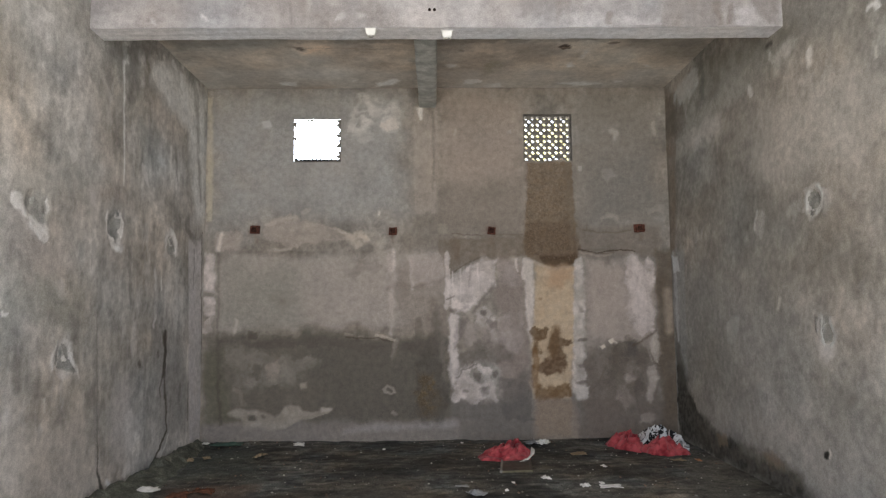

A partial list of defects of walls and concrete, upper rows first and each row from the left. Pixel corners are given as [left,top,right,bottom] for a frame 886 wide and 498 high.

water stain [864,0,883,16]
spalling [7,187,53,249]
spalling [104,206,128,255]
water stain [106,39,534,431]
water stain [437,0,825,498]
spalling [801,179,835,225]
peeling [581,257,636,351]
spalling [47,327,81,384]
crack [137,326,169,462]